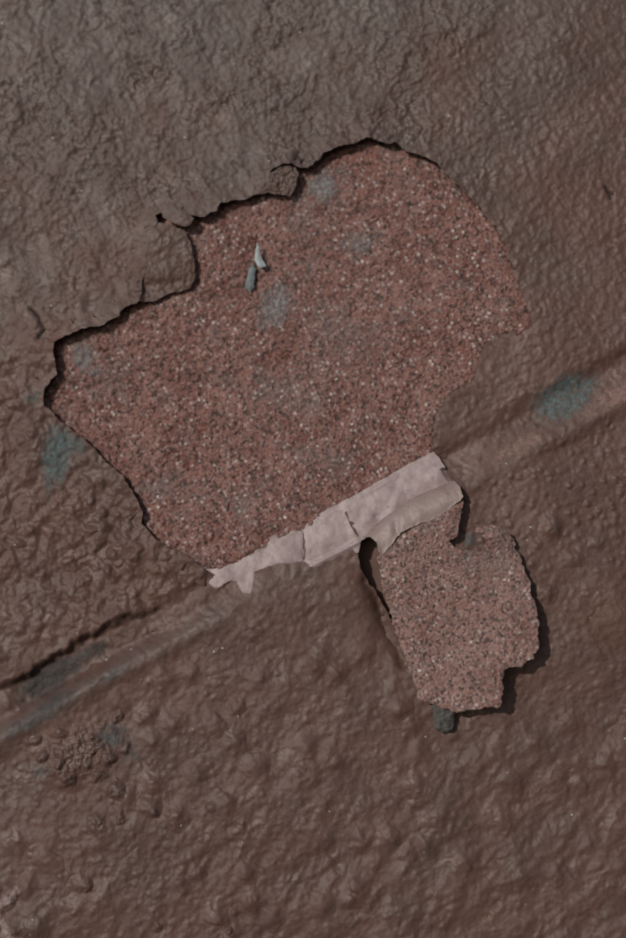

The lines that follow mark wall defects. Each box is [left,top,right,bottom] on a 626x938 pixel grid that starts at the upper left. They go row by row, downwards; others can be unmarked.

peeling [43,137,530,594]